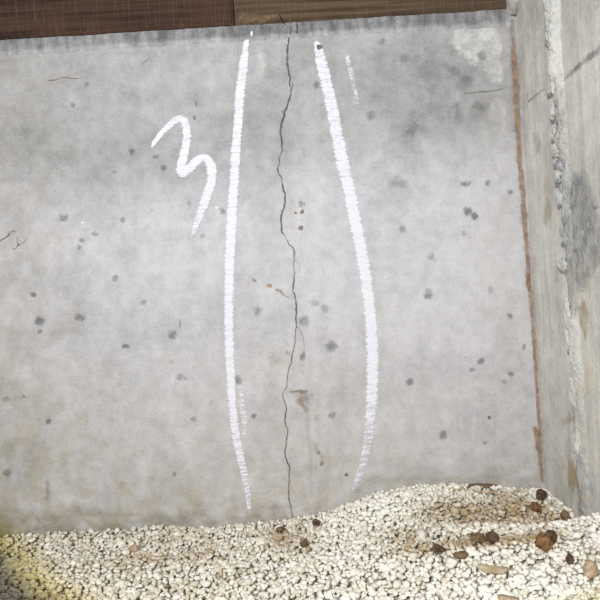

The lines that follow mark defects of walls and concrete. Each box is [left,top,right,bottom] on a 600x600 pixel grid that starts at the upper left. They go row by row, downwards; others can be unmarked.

crack [277,14,298,252]
rust [512,46,542,479]
crack [283,277,304,517]